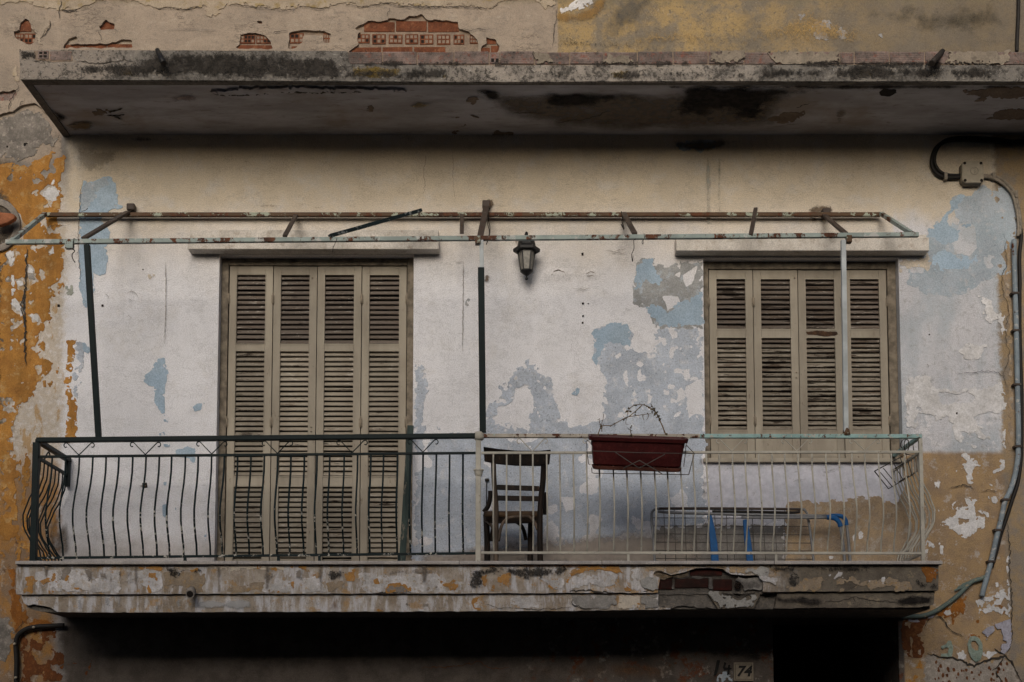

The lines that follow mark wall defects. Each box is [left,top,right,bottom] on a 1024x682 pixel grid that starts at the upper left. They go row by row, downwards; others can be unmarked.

peeling [0,0,106,11]
spalling [15,20,132,62]
spalling [123,0,783,65]
water stain [480,38,1012,128]
flaking render [799,14,1024,65]
crack [20,246,28,362]
peeling [0,108,163,682]
peeling [144,358,196,463]
peeling [190,258,944,610]
peeling [899,185,1017,538]